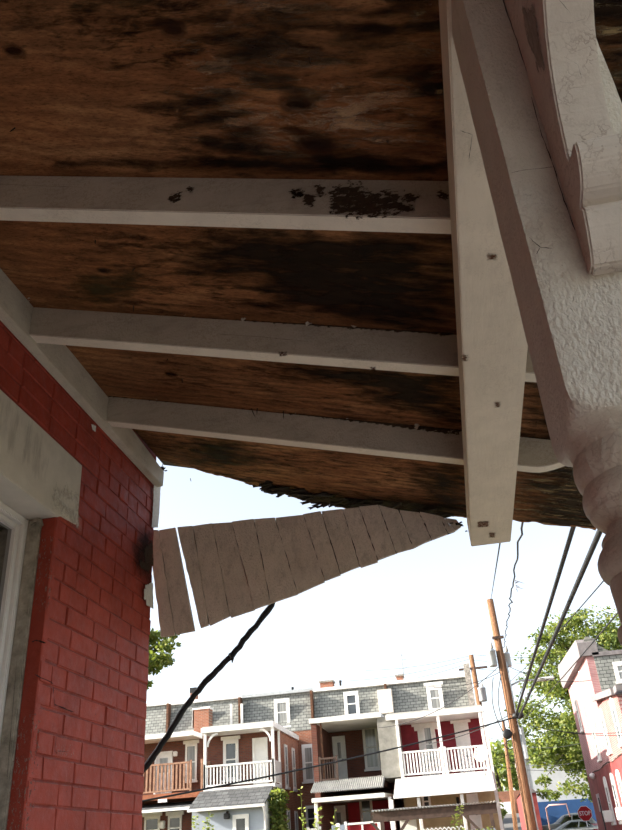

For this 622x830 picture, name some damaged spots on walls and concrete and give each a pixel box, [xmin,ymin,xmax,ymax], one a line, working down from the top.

damp [593,0,622,102]
damp [143,0,447,176]
peeling [168,186,193,203]
peeling [289,179,420,220]
damp [176,229,456,332]
damp [252,364,462,431]
damp [520,382,551,440]
damp [147,435,355,489]
damp [412,463,467,516]
damp [520,466,594,528]